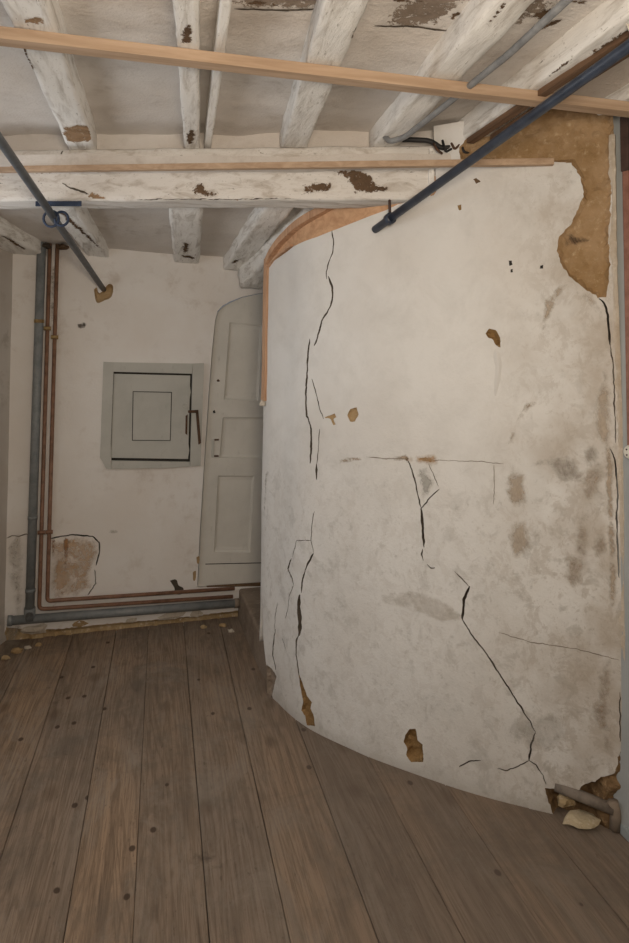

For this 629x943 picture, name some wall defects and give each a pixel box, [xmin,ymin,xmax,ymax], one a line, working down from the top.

peeling [387,0,464,29]
peeling [304,170,388,194]
flaking render [459,109,614,298]
crack [305,233,334,480]
flaking render [486,329,500,347]
crack [599,299,620,573]
crack [272,511,315,680]
crack [370,457,546,784]
crack [502,633,618,660]
flaking render [404,729,424,762]
crack [616,697,624,742]
flaking render [545,752,621,829]